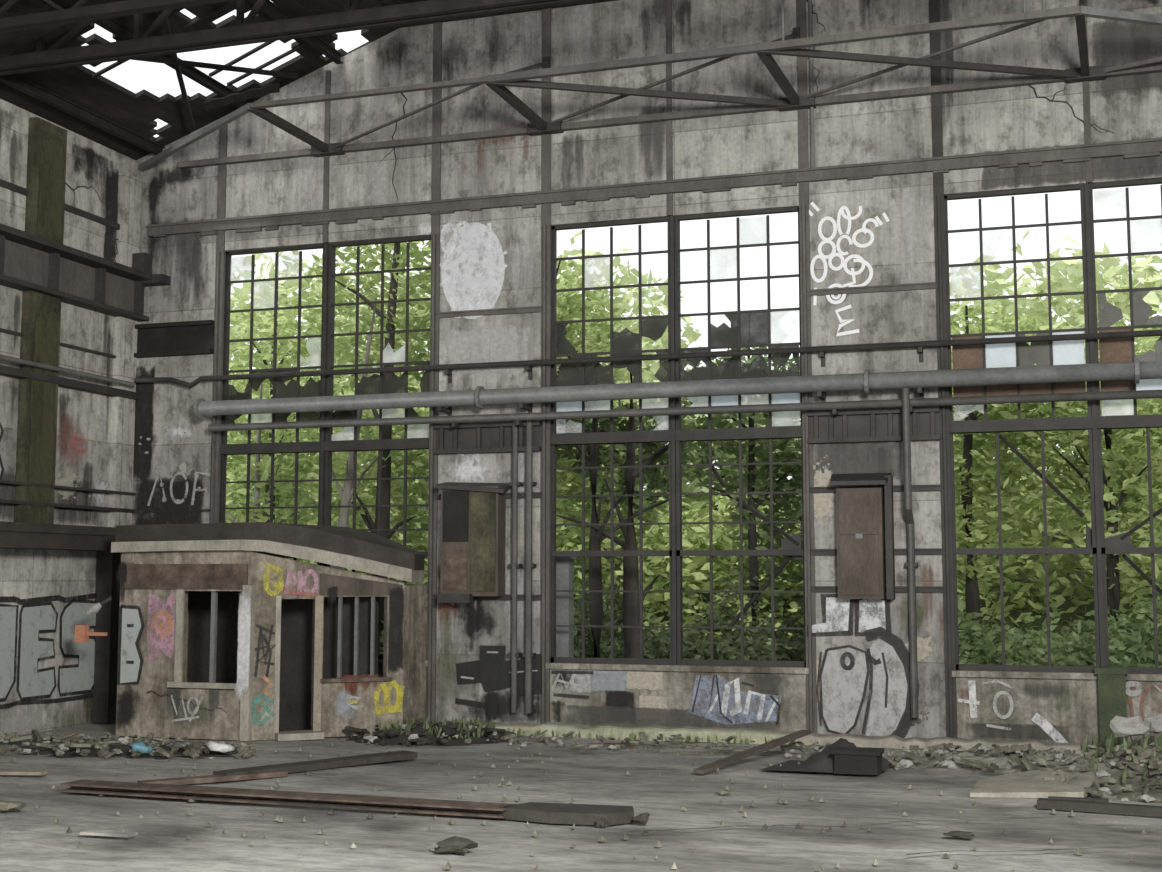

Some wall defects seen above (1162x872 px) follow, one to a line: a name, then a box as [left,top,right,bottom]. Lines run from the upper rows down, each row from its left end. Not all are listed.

water stain [562,136,583,185]
water stain [640,108,666,176]
water stain [91,158,119,260]